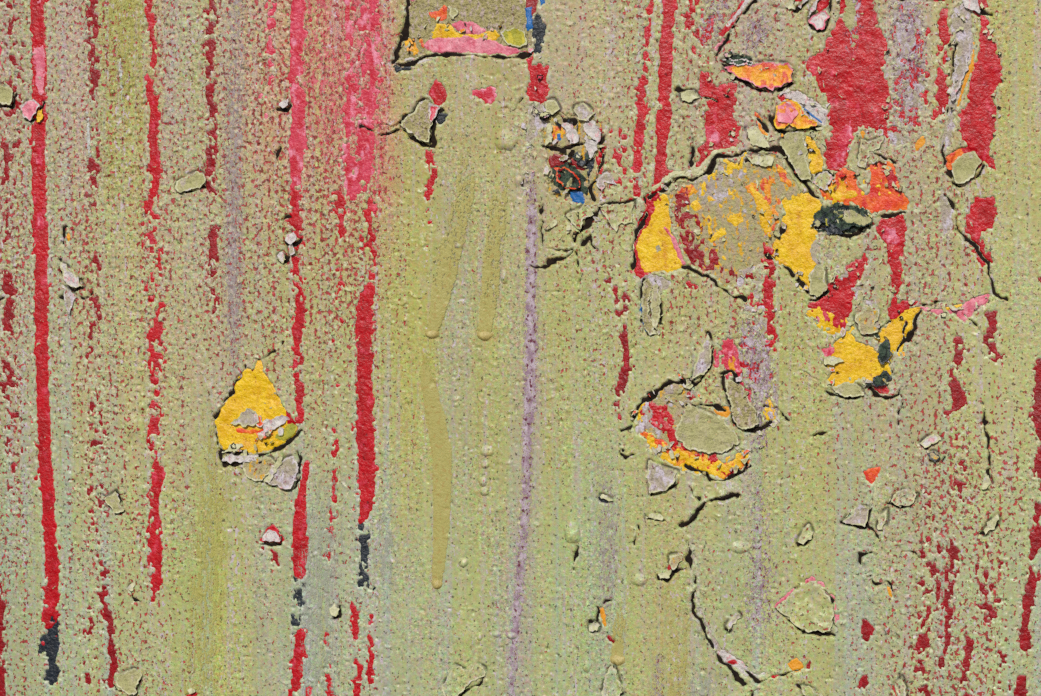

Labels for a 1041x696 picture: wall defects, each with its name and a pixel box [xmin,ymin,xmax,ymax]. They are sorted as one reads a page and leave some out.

peeling [359,79,448,148]
peeling [391,0,1003,425]
peeling [213,341,303,489]
peeling [620,332,780,496]
peeling [920,433,945,466]
crack [679,487,810,696]
peeling [774,576,840,636]